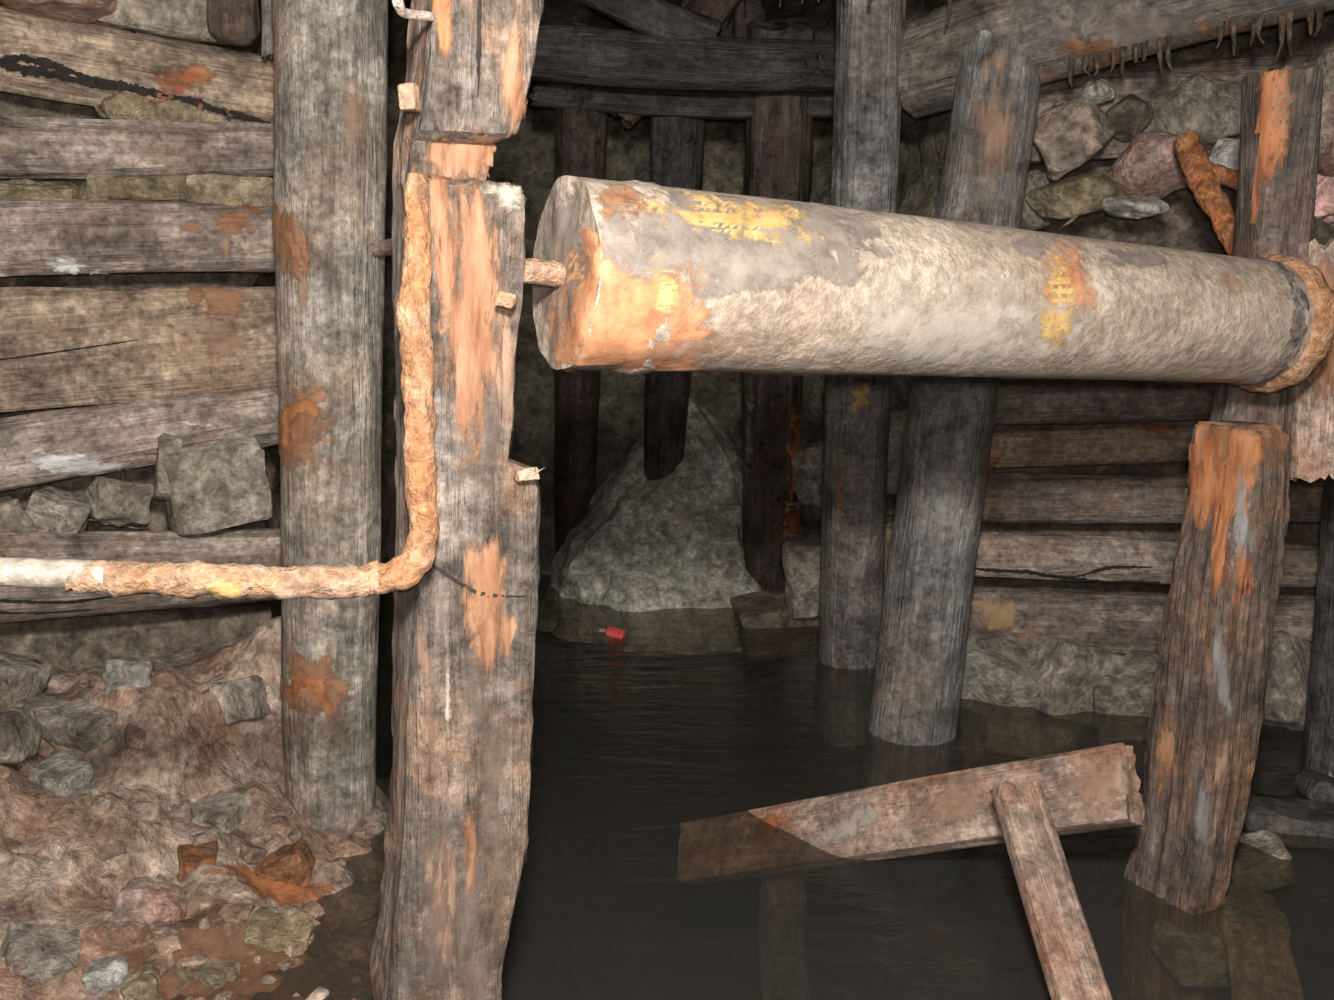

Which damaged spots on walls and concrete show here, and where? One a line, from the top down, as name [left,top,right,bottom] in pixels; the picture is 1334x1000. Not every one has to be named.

crack [0,54,271,124]
rust [180,202,311,310]
rust [186,285,249,354]
rust [278,383,335,474]